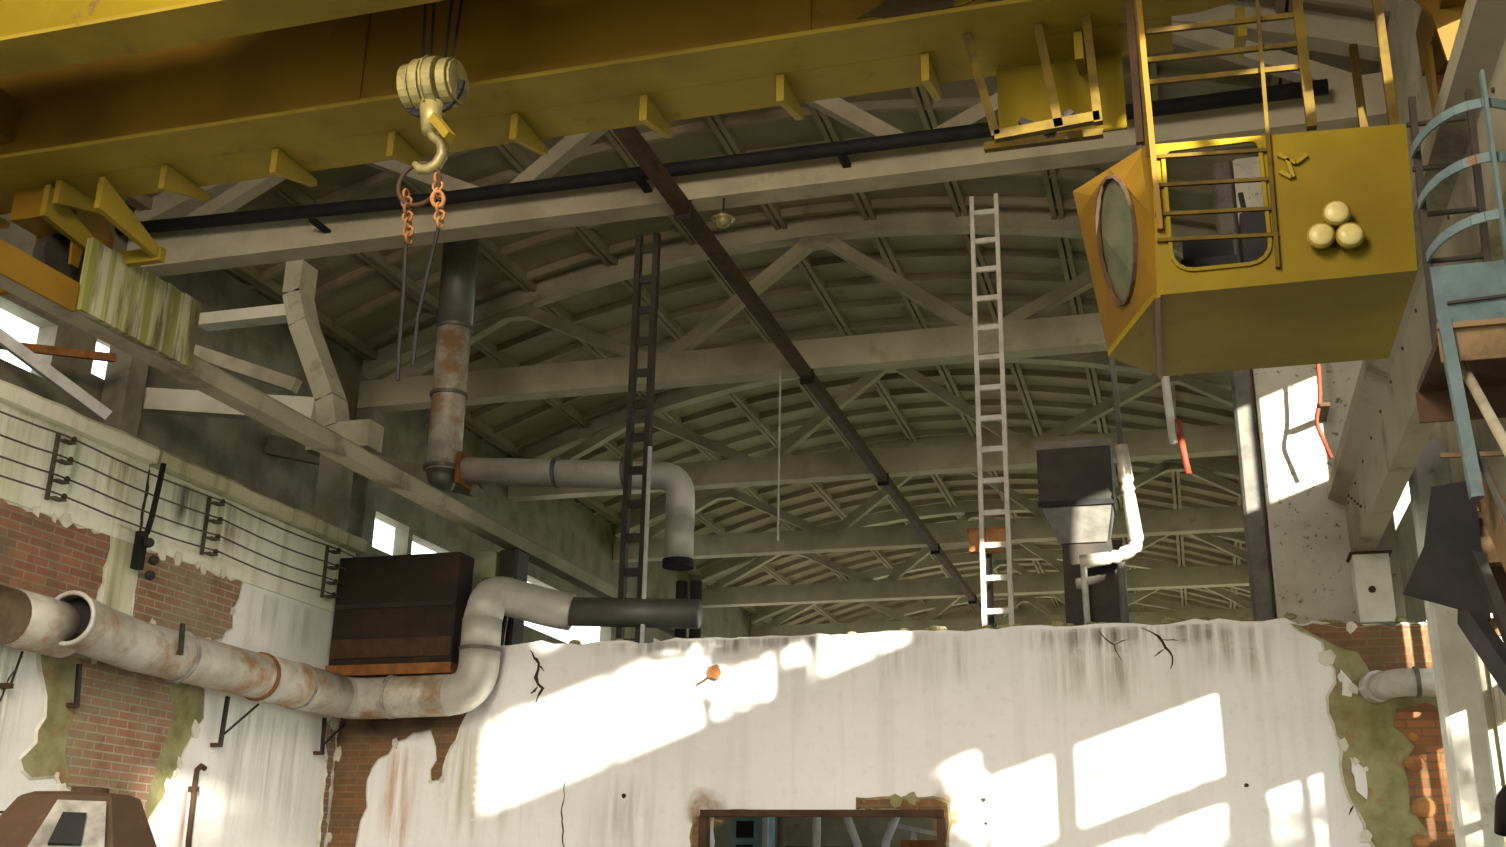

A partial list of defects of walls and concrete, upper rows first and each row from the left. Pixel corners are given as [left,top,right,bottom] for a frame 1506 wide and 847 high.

flaking render [0,497,111,600]
flaking render [130,543,243,641]
crack [530,650,544,703]
crack [1098,628,1178,669]
flaking render [318,707,477,847]
flaking render [1289,620,1456,847]